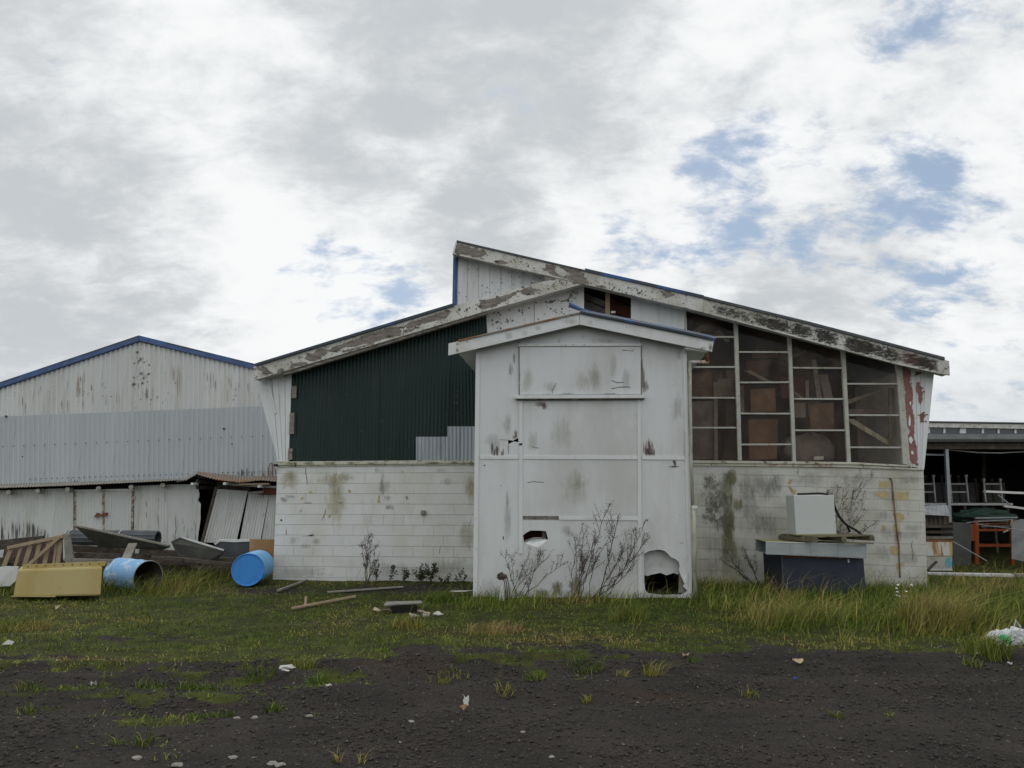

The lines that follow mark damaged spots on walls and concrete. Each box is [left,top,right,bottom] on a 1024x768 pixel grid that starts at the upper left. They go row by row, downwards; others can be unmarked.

peeling [454,244,508,265]
peeling [478,264,589,309]
peeling [402,309,451,330]
peeling [751,316,932,465]
leakage [723,472,742,554]